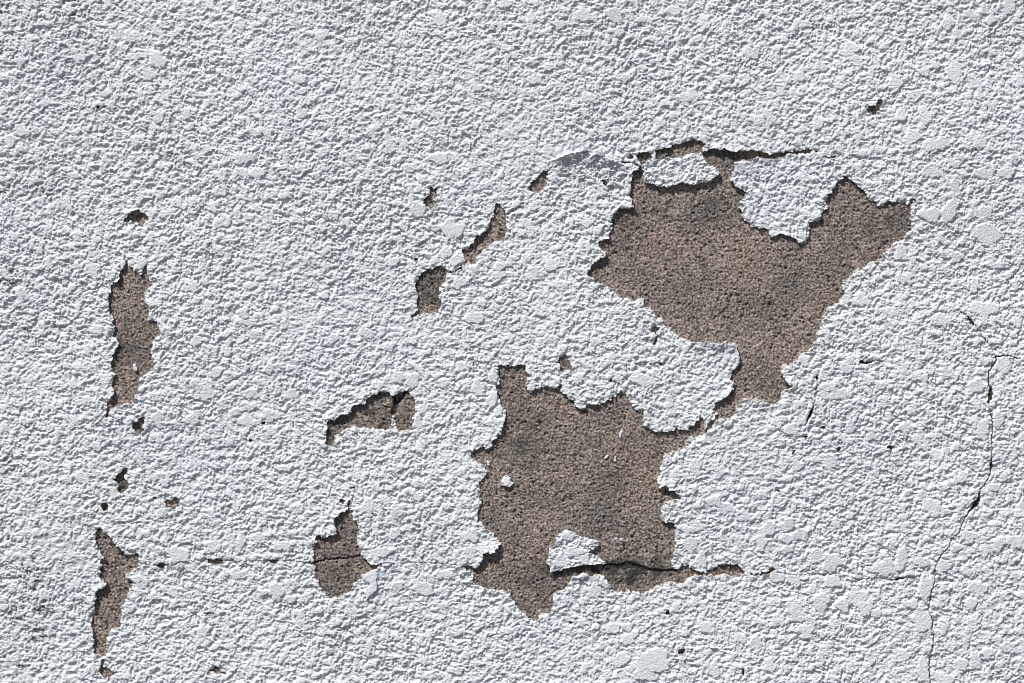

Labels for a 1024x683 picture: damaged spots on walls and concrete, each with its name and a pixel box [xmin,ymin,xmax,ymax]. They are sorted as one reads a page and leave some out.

spalling [105,261,161,418]
spalling [123,209,149,227]
spalling [325,390,416,446]
spalling [409,203,507,323]
spalling [462,139,916,622]
spalling [91,528,140,681]
spalling [307,487,382,600]
crack [803,312,1018,683]